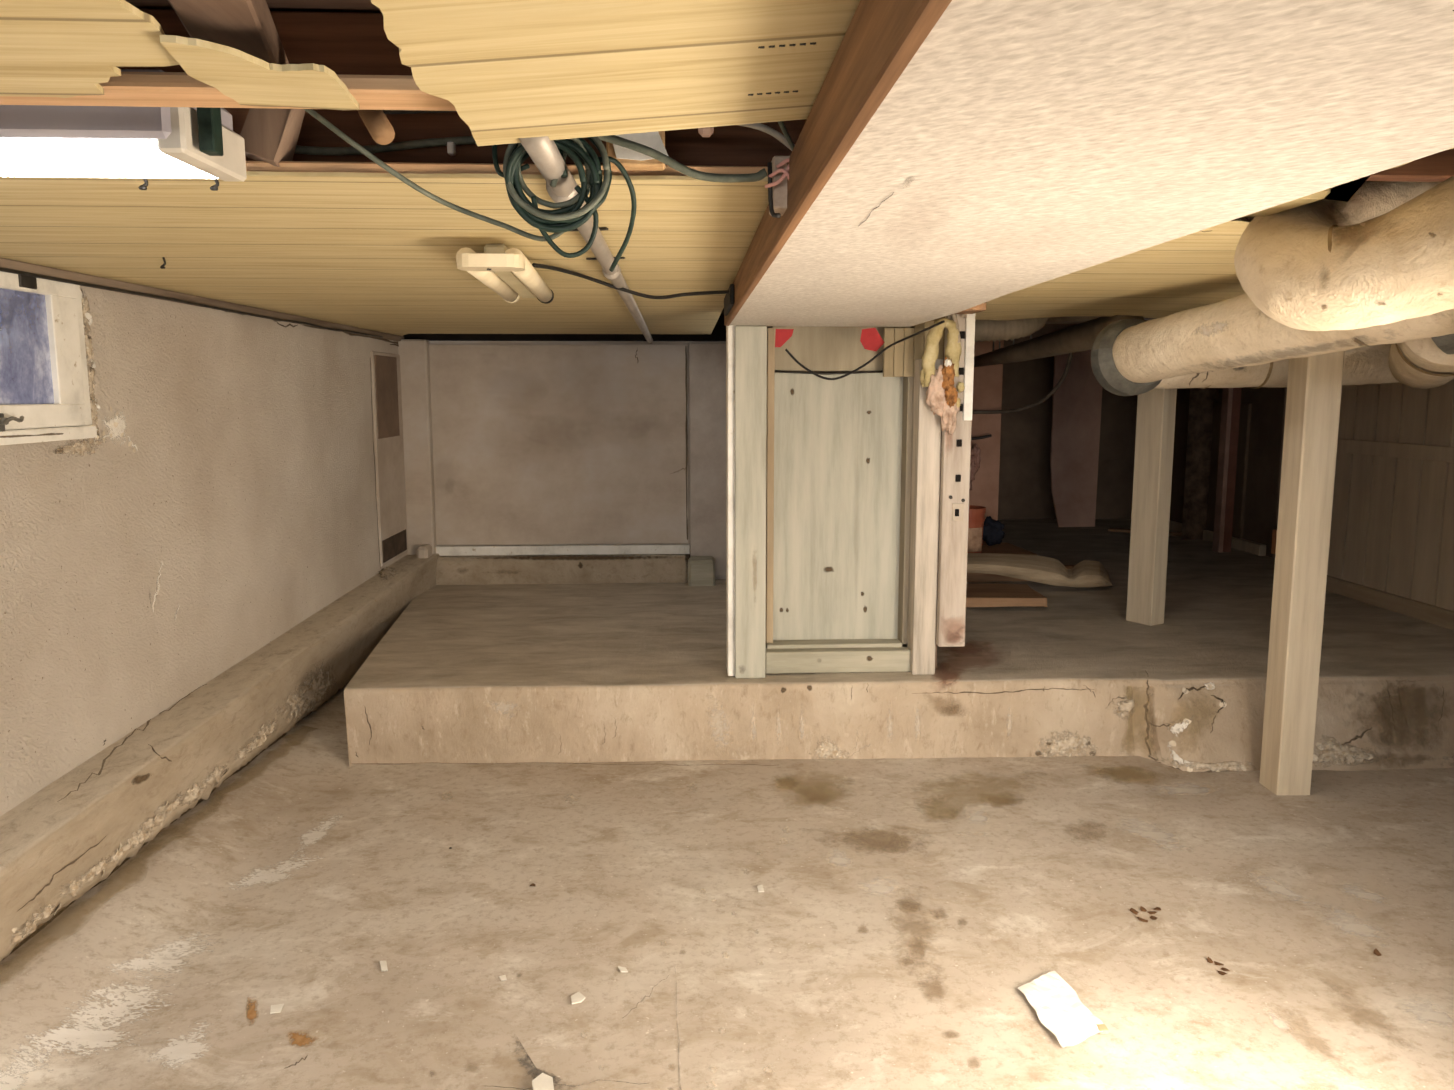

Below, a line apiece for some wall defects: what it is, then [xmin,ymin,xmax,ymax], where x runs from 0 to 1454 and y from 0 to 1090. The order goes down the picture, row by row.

crack [57,684,206,802]
peeling [1179,682,1227,733]
spalling [1161,718,1251,772]
flaking render [12,665,336,943]
crack [18,839,103,911]
flaking render [270,1004,284,1014]